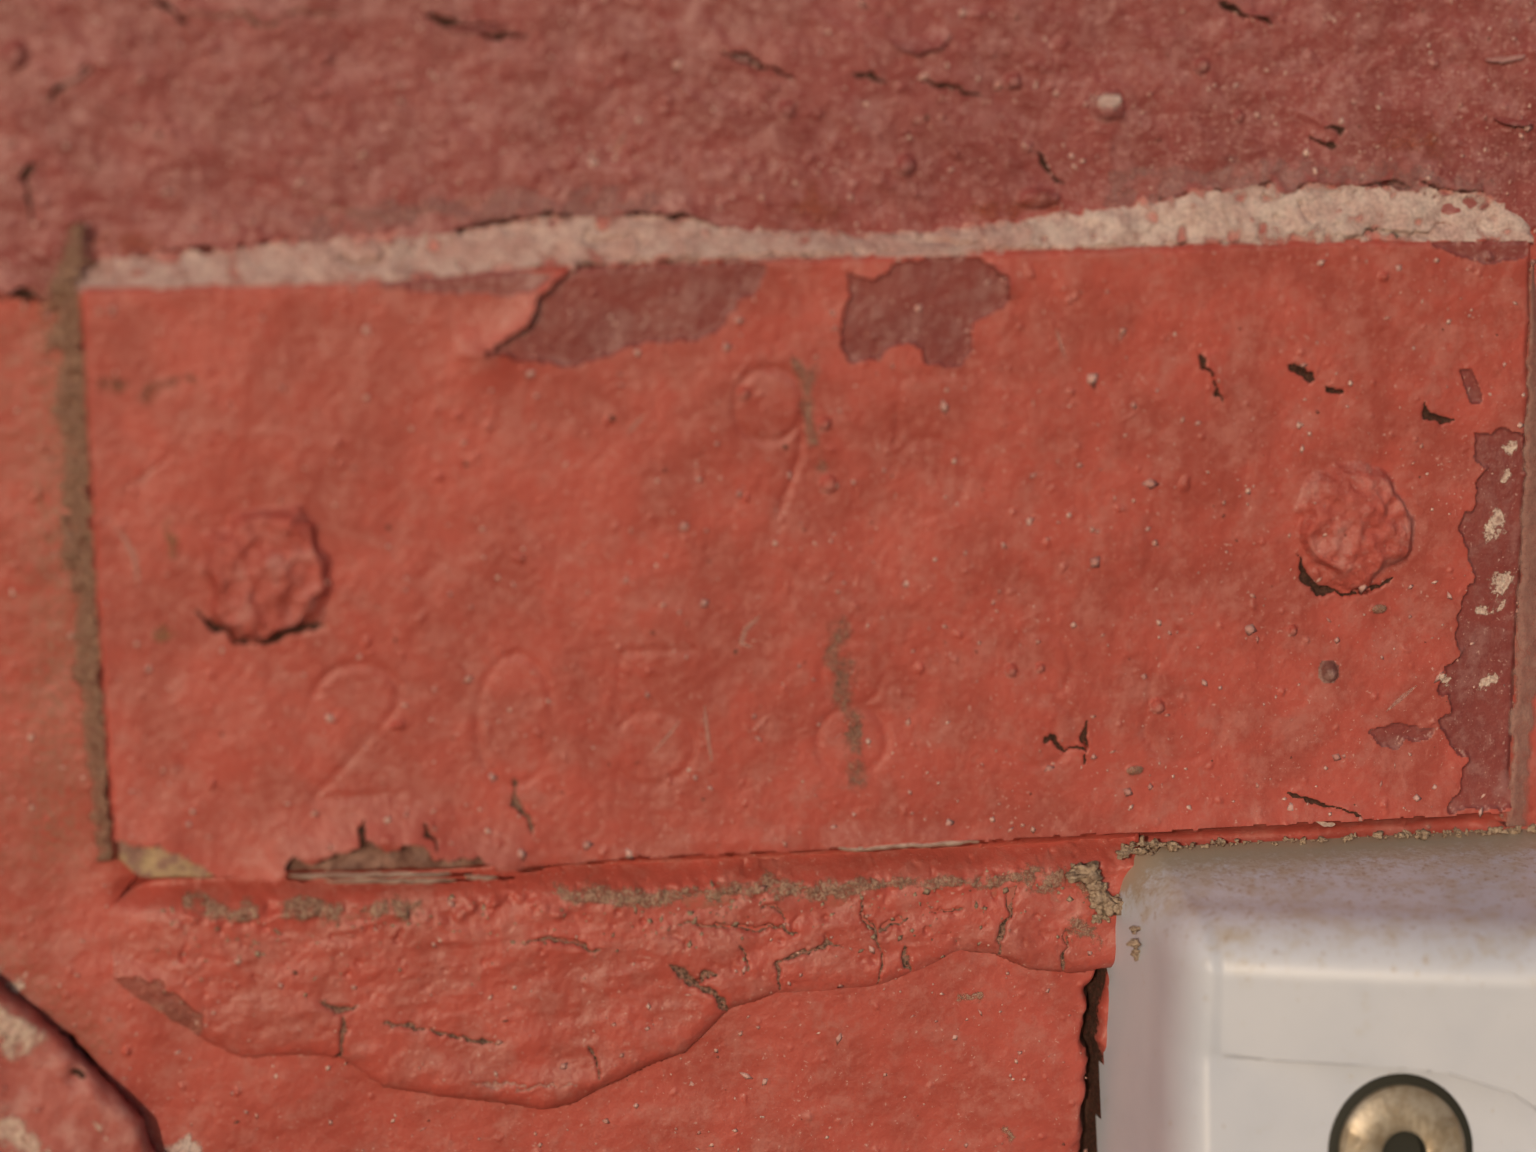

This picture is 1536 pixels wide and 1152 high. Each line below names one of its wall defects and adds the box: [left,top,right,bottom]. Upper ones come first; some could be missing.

crack [422,12,529,41]
crack [1217,0,1272,26]
crack [851,71,981,97]
peeling [1431,239,1528,265]
peeling [378,259,766,367]
peeling [840,255,1011,368]
peeling [1368,427,1527,815]
crack [357,820,366,845]
crack [423,823,438,851]
crack [996,885,1017,955]
crack [527,936,601,953]
crack [669,901,963,1011]